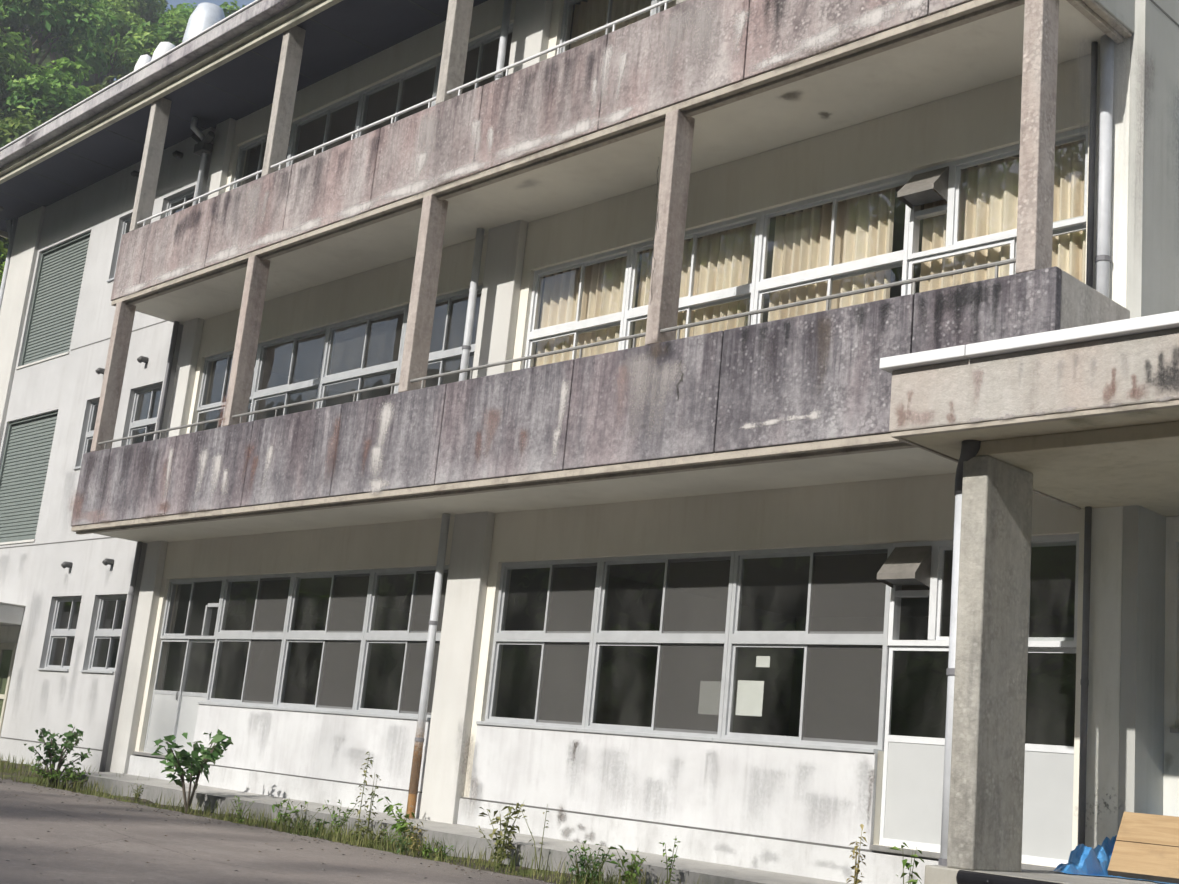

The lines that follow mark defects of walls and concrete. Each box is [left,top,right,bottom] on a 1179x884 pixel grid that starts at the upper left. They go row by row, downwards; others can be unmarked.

leakage [734,11,746,43]
leakage [756,26,839,69]
leakage [852,0,924,28]
leakage [593,46,626,98]
leakage [340,107,632,216]
leakage [206,219,321,263]
leakage [124,266,190,294]
leakage [553,382,568,451]
leakage [742,411,819,429]
leakage [199,450,227,489]
leakage [370,404,392,493]